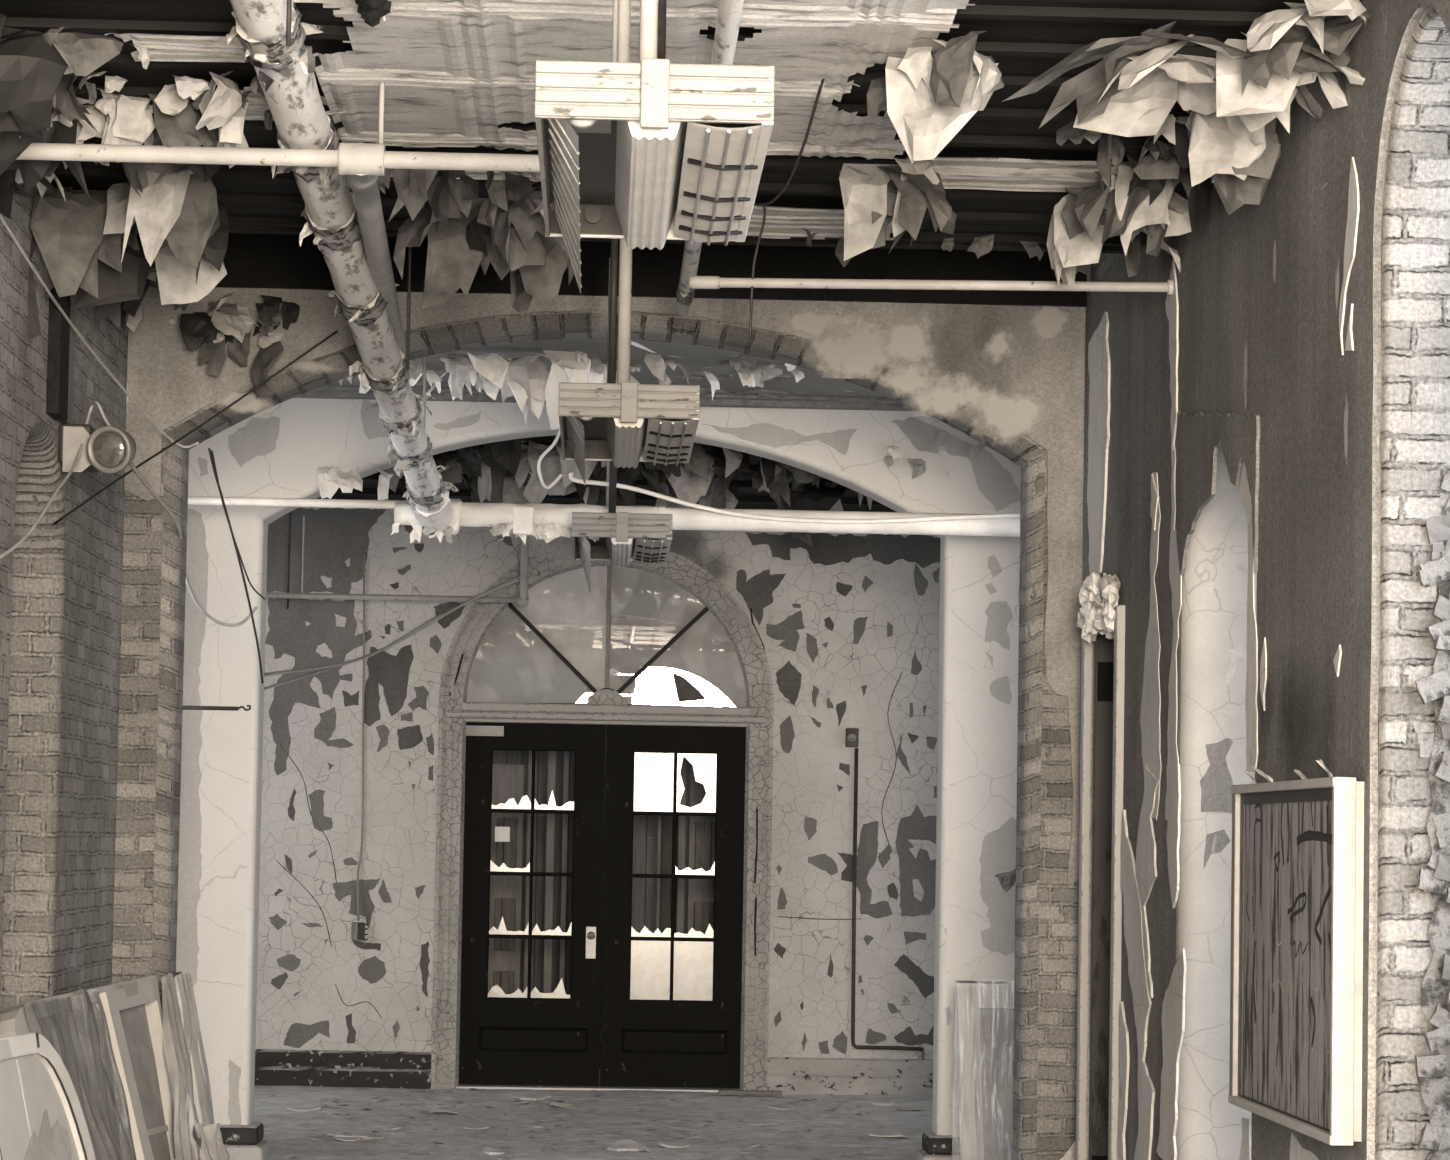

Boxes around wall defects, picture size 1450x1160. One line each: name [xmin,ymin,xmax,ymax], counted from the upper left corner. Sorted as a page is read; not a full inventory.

peeling [265,350,873,790]
peeling [736,532,940,753]
flaking render [835,0,1372,1160]
peeling [288,789,333,832]
spalling [1414,471,1450,1160]
peeling [271,954,304,997]
peeling [269,914,323,930]
peeling [284,1013,356,1048]
peeling [333,857,392,984]
peeling [416,942,430,1011]
peeling [802,1031,848,1055]
peeling [804,805,937,999]